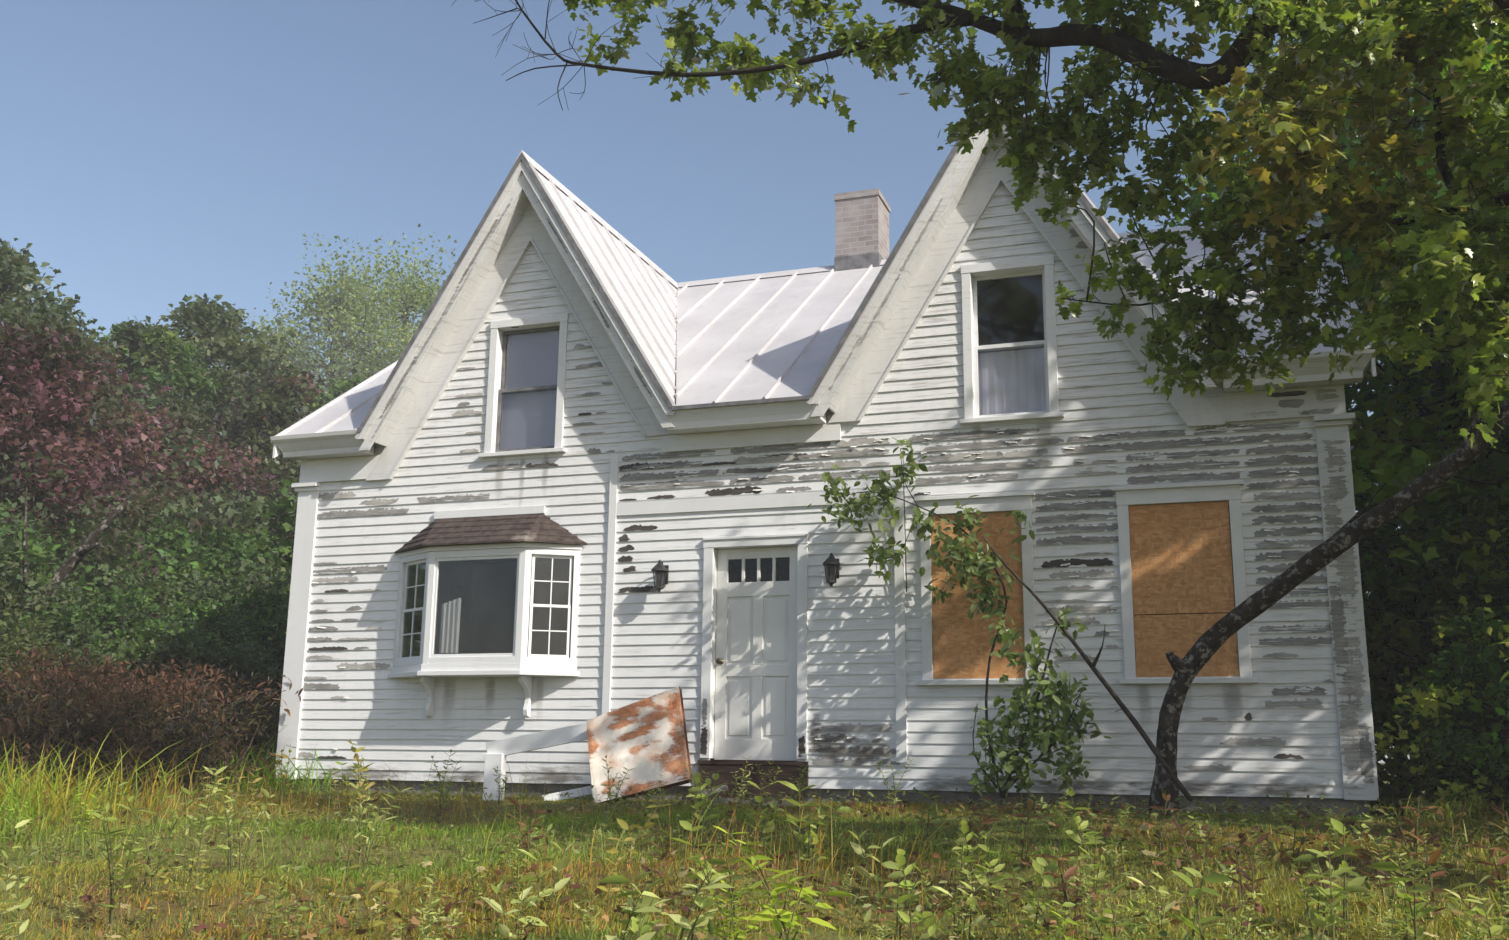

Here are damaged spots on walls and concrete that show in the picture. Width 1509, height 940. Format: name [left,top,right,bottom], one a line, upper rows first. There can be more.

peeling [452,393,558,471]
peeling [573,344,892,501]
peeling [317,491,490,518]
peeling [617,524,657,593]
peeling [909,389,1349,661]
peeling [303,562,391,699]
peeling [1220,547,1375,794]
peeling [298,748,346,759]
peeling [808,721,900,766]